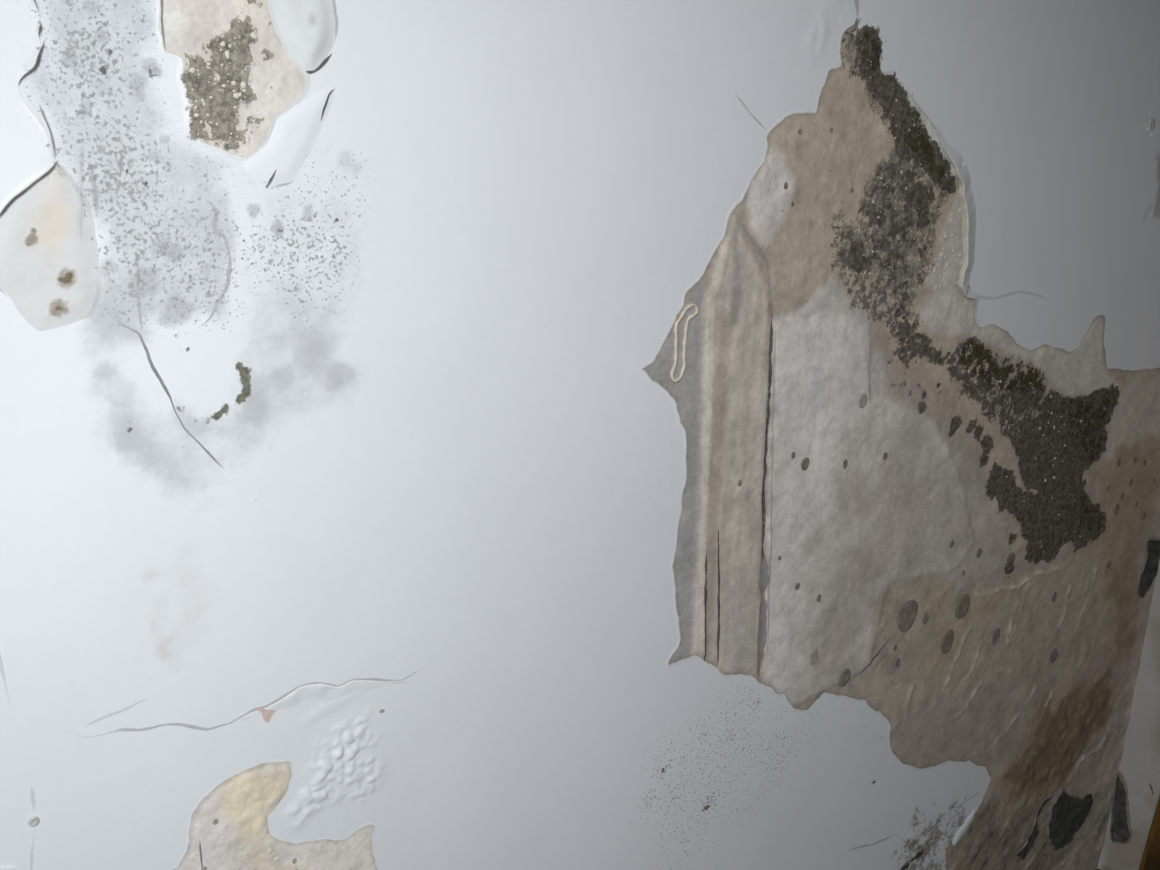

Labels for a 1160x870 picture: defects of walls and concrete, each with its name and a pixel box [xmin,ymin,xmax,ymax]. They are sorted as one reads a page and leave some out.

peeling [0,0,101,331]
mould [26,0,365,367]
mould [212,362,265,422]
peeling [155,0,336,189]
peeling [640,16,1160,870]
mould [831,18,1119,578]
peeling [168,759,379,870]
mould [895,803,964,870]